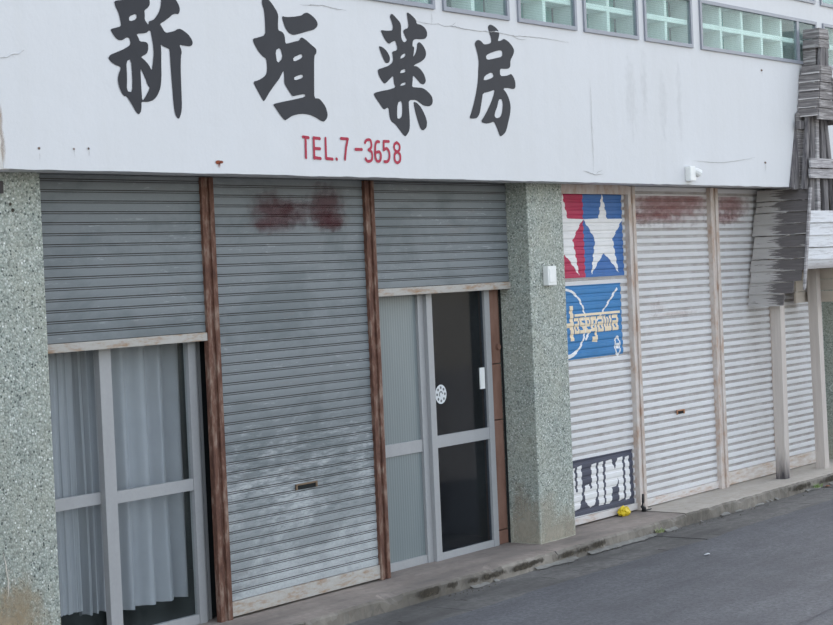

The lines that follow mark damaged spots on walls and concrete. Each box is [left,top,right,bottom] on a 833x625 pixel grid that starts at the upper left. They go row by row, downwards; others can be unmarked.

crack [421,14,569,43]